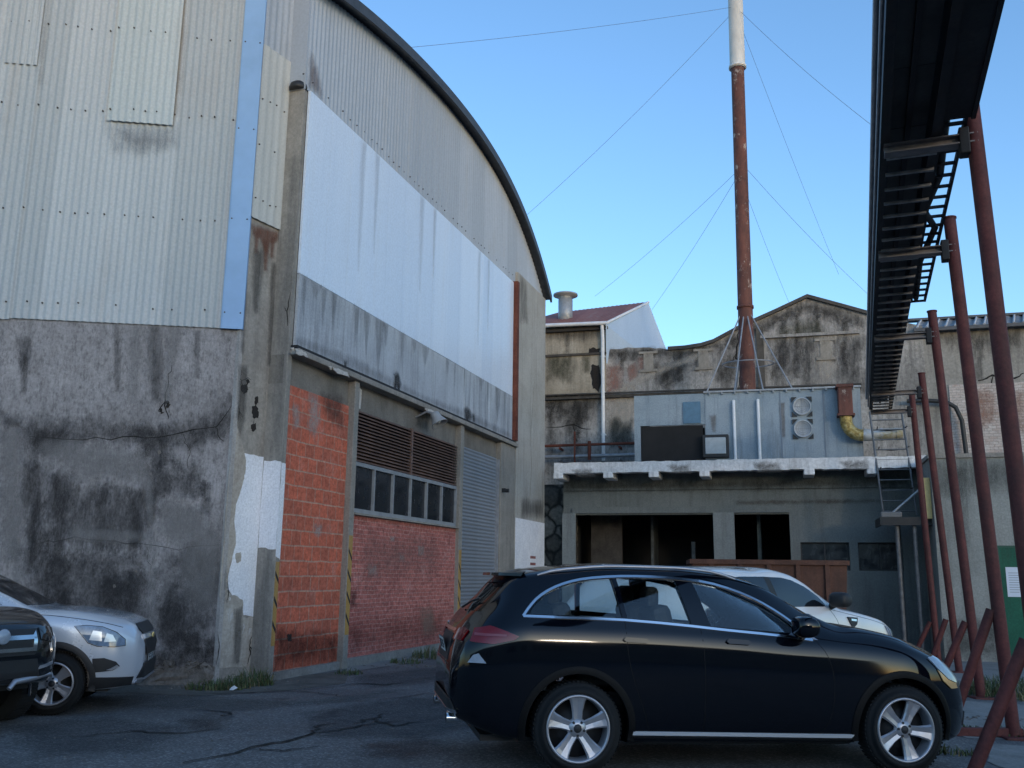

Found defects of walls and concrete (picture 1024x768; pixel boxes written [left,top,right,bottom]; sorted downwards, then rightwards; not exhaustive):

corrosion [254,226,278,268]
damp [609,336,739,385]
damp [753,306,864,391]
crack [29,367,254,466]
damp [547,395,595,452]
damp [611,420,631,447]
damp [26,369,247,612]
peeling [135,379,259,685]
damp [151,548,219,668]